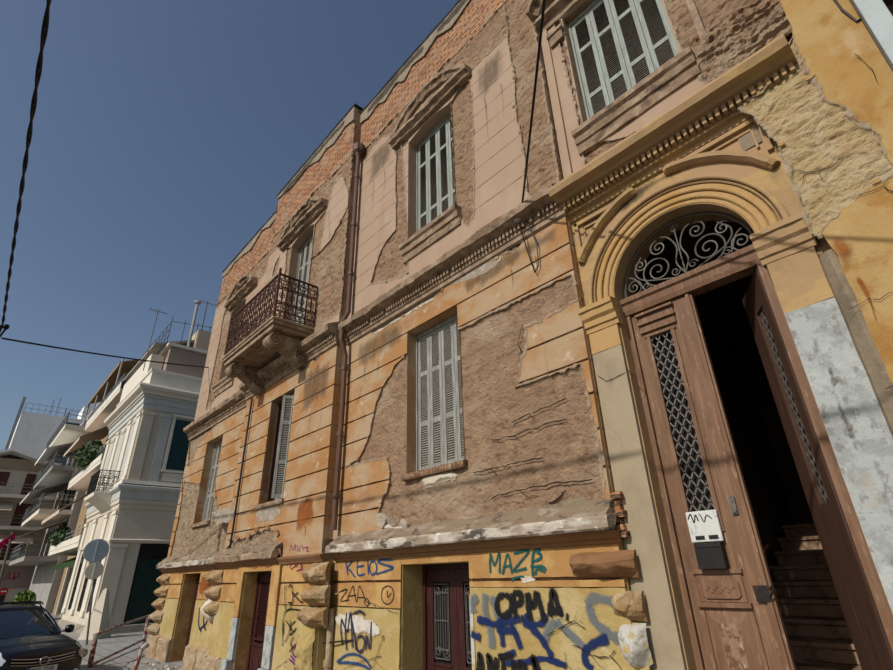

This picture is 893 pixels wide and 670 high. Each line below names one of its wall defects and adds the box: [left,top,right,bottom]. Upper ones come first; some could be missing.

flaking render [582,129,639,166]
flaking render [664,0,893,239]
flaking render [205,0,559,410]
rust [857,277,876,320]
flaking render [345,274,630,537]
flaking render [169,481,283,558]
rust [297,499,312,536]